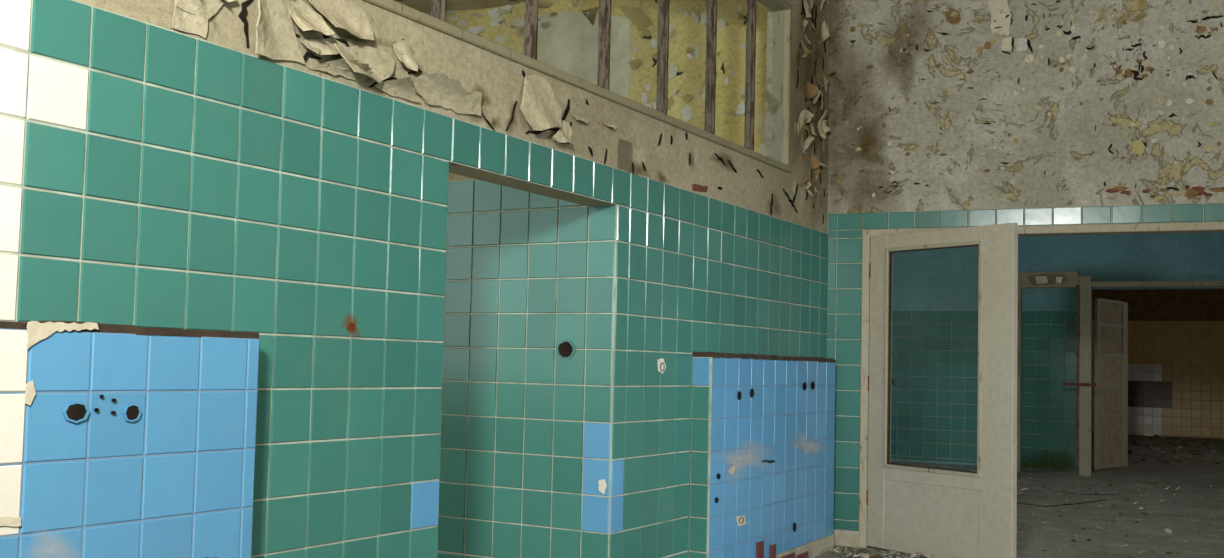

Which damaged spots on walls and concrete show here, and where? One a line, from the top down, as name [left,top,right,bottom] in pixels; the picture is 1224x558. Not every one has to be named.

flaking render [172,0,746,165]
flaking render [692,184,723,192]
peeling [770,0,836,224]
damp [850,119,877,162]
peeling [854,33,955,198]
peeling [976,0,1224,185]
flaking render [1104,141,1224,199]